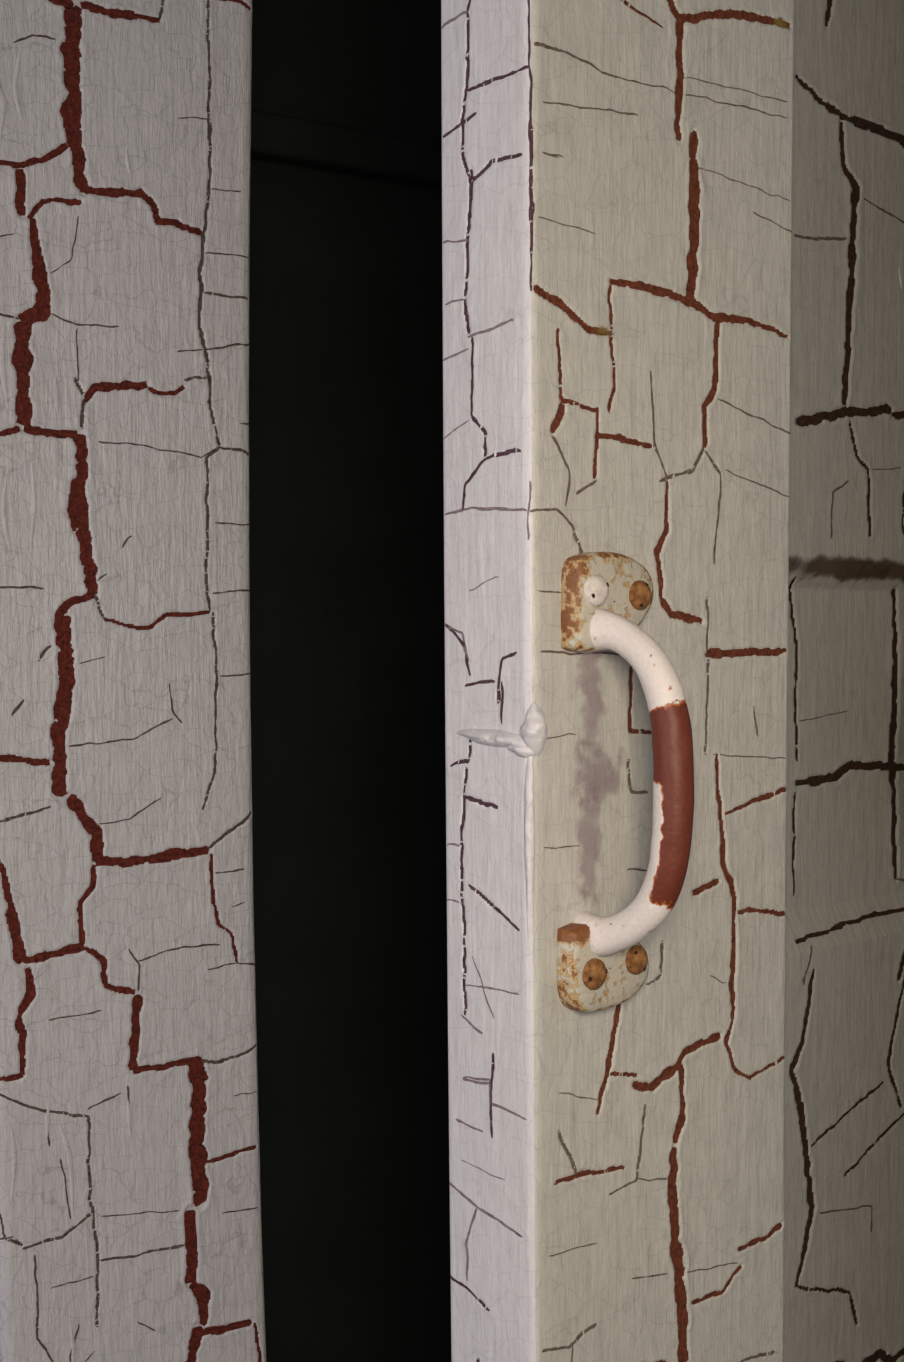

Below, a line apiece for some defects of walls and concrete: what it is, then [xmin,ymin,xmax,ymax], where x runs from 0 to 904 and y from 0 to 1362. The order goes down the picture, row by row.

crack [0,0,262,1362]
crack [441,0,904,1362]